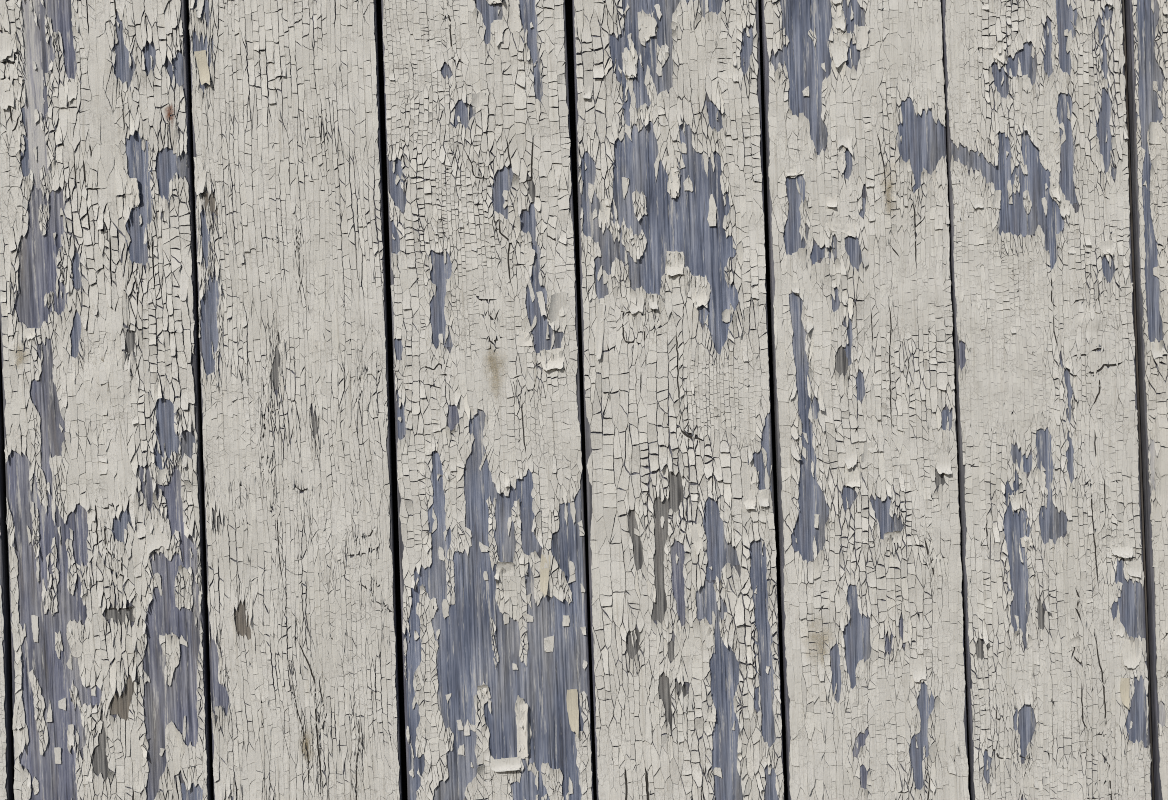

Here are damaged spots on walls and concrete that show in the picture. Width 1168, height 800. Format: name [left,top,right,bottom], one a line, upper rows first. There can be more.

crack [74,146,155,333]
peeling [0,0,231,800]
crack [292,640,360,800]
peeling [404,385,588,800]
crack [476,220,561,350]
crack [625,768,649,800]
crack [621,294,700,439]
peeling [580,0,744,361]
peeling [620,445,783,800]
peeling [768,0,904,579]
peeling [894,0,1116,270]
crack [1051,279,1122,800]